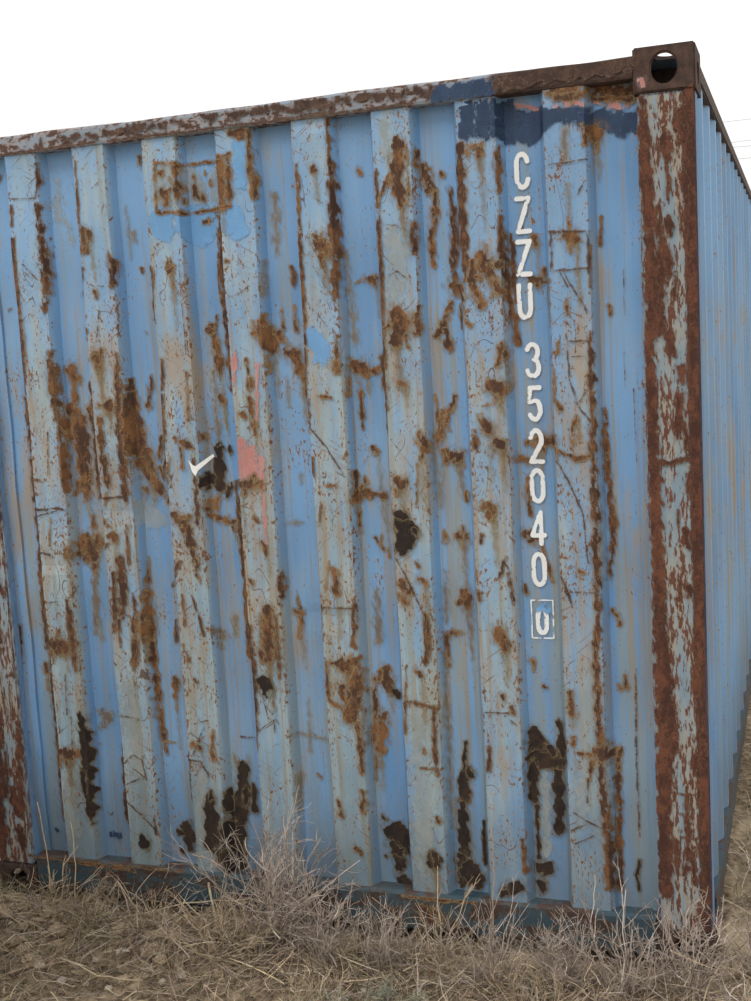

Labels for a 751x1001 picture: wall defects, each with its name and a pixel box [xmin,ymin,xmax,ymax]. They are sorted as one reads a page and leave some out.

rust [0,84,642,928]
rust [492,52,711,906]